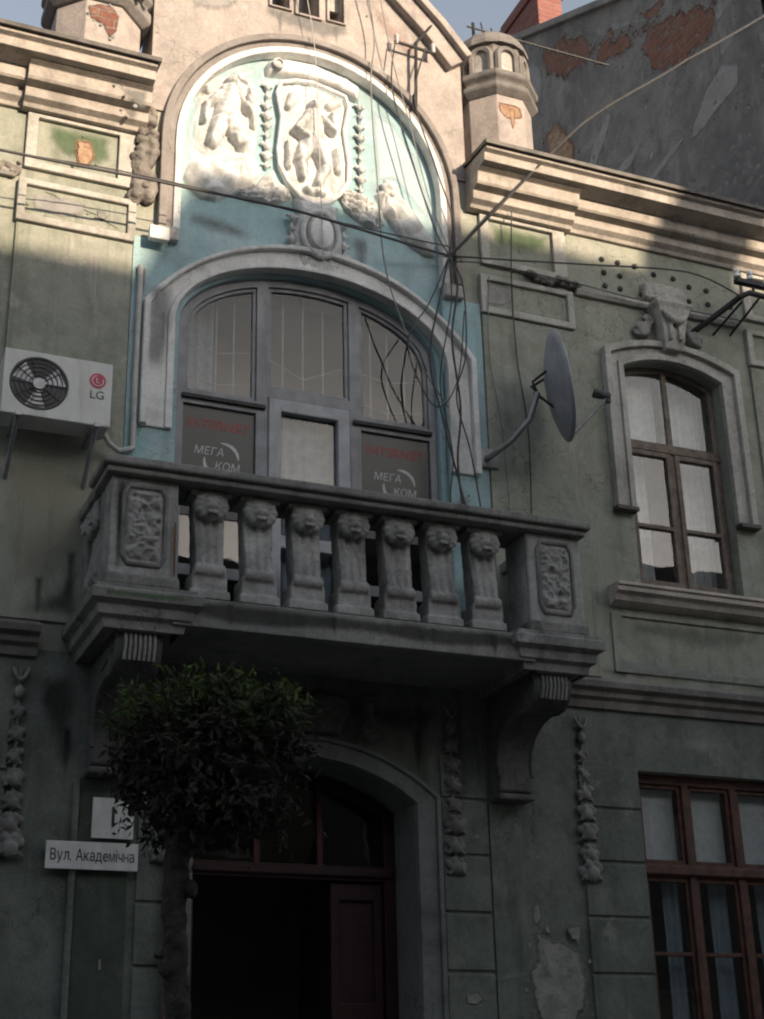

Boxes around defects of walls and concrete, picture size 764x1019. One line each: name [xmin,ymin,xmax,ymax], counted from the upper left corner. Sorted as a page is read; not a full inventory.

flaking render [87,4,119,40]
flaking render [528,0,720,114]
spalling [72,134,98,167]
flaking render [541,122,578,159]
spalling [524,905,594,1019]